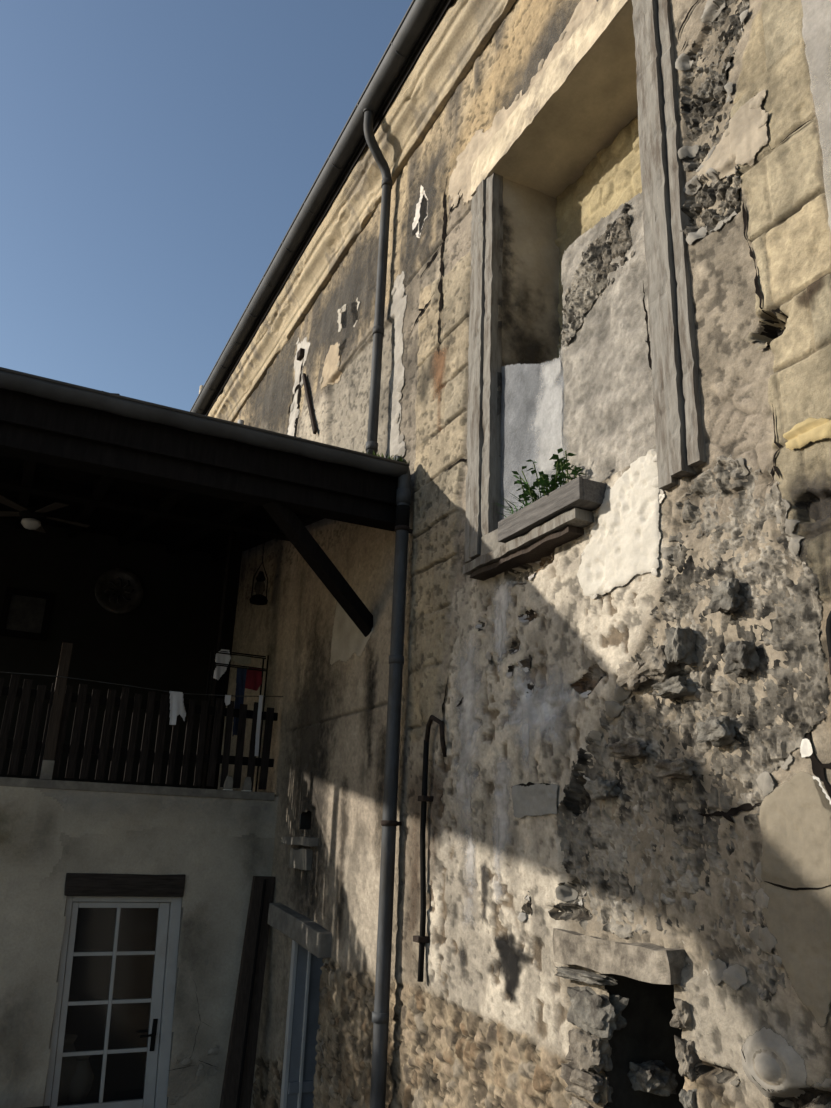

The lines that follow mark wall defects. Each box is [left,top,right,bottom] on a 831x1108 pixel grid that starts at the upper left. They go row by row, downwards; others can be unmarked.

peeling [448,0,597,208]
spalling [675,0,768,245]
peeling [412,185,428,238]
crack [411,176,461,354]
peeling [287,337,310,436]
peeling [319,297,360,390]
spalling [534,202,634,474]
peeling [783,417,831,450]
spalling [548,449,830,1006]
leakage [495,934,529,1002]
spalling [604,974,741,1108]
spalling [768,1078,831,1108]